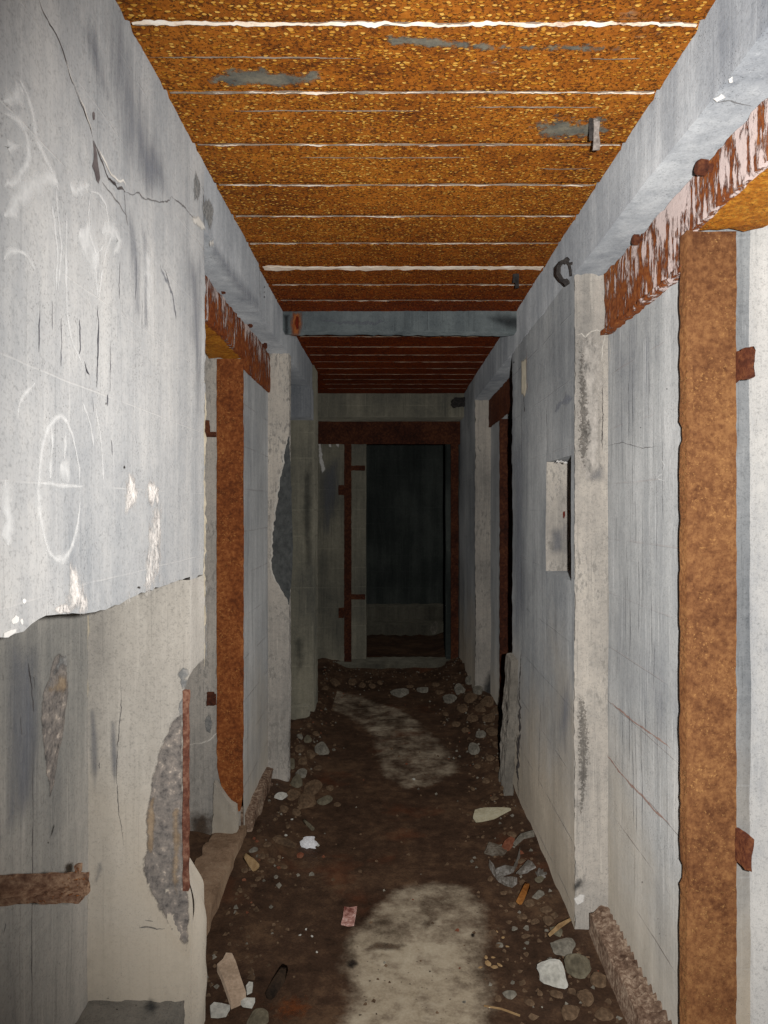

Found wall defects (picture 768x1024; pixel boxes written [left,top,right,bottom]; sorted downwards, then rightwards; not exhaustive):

crack [39,1,194,224]
peeling [4,615,23,638]
peeling [55,564,87,614]
peeling [125,475,161,592]
spalling [269,437,293,605]
spalling [41,654,68,795]
spalling [143,668,189,944]